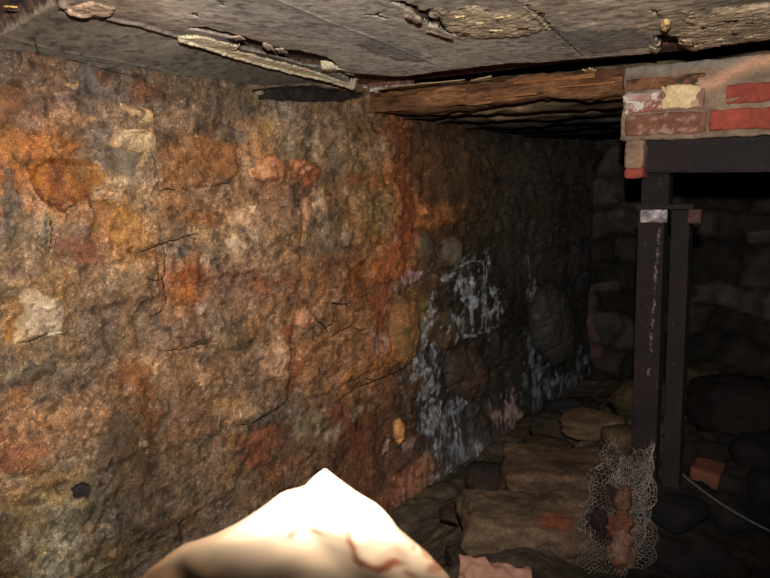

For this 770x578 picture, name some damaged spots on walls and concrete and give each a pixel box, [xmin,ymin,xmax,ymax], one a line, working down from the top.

spalling [64,1,115,19]
peeling [178,1,770,102]
rust [0,79,144,249]
crack [31,182,102,253]
crack [137,234,196,317]
rust [361,179,466,342]
crack [162,340,218,352]
crack [314,299,366,337]
crack [338,359,415,402]
water stain [399,247,593,481]
rust [235,416,293,469]